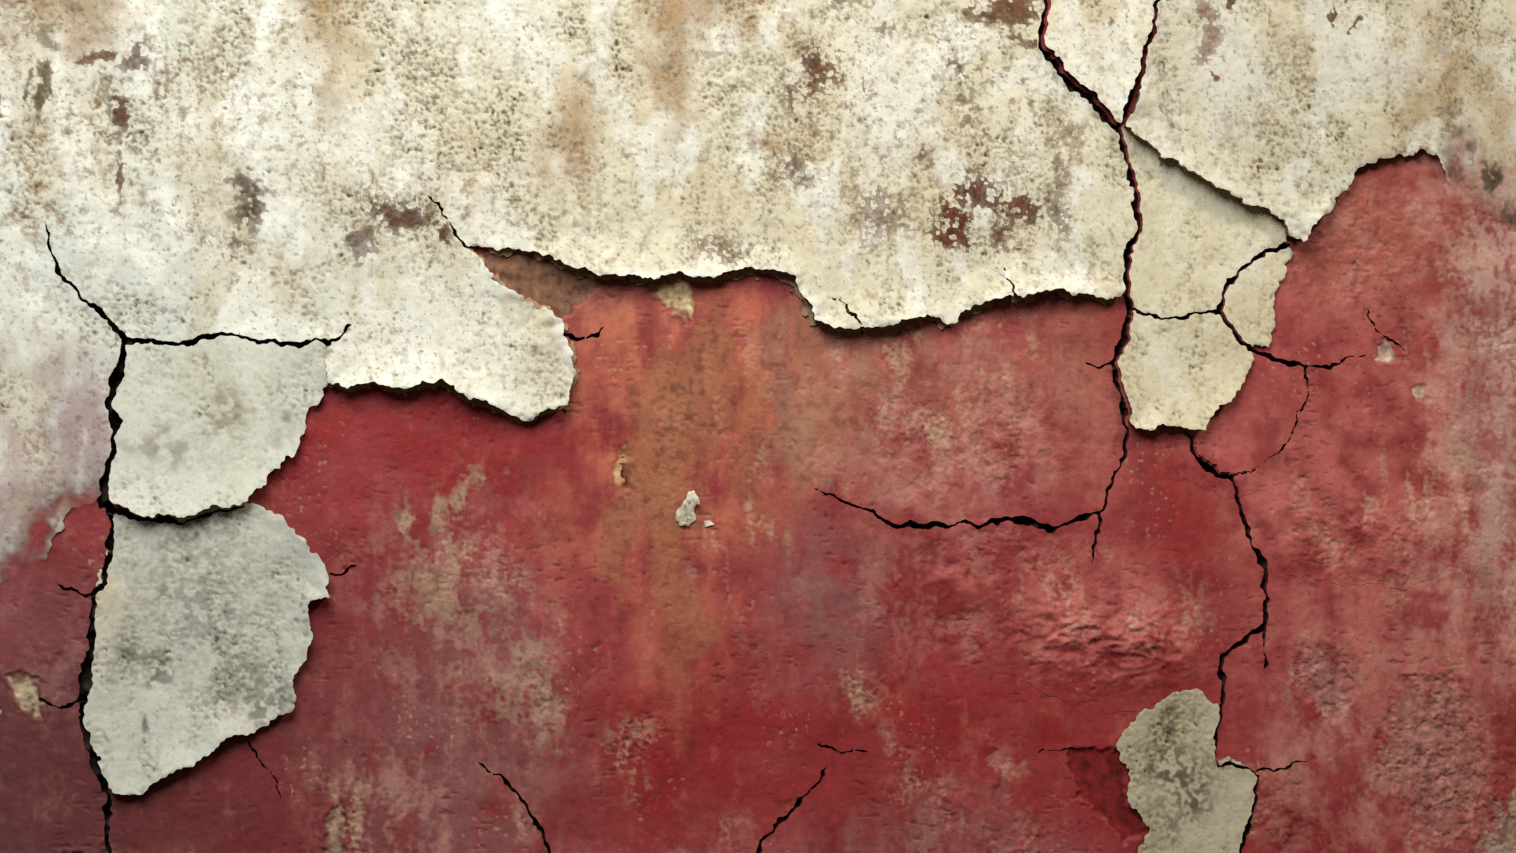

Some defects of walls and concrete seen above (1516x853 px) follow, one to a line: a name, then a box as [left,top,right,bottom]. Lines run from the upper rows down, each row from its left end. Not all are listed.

crack [824,11,1361,534]
peeling [1044,0,1516,431]
peeling [0,0,1138,795]
crack [40,229,350,853]
crack [1195,458,1266,680]
peeling [325,806,345,853]
crack [479,763,550,853]
crack [756,743,864,853]
peeling [1069,688,1257,853]
crack [1215,758,1298,774]
peeling [1391,682,1472,836]
peeling [1485,790,1516,853]